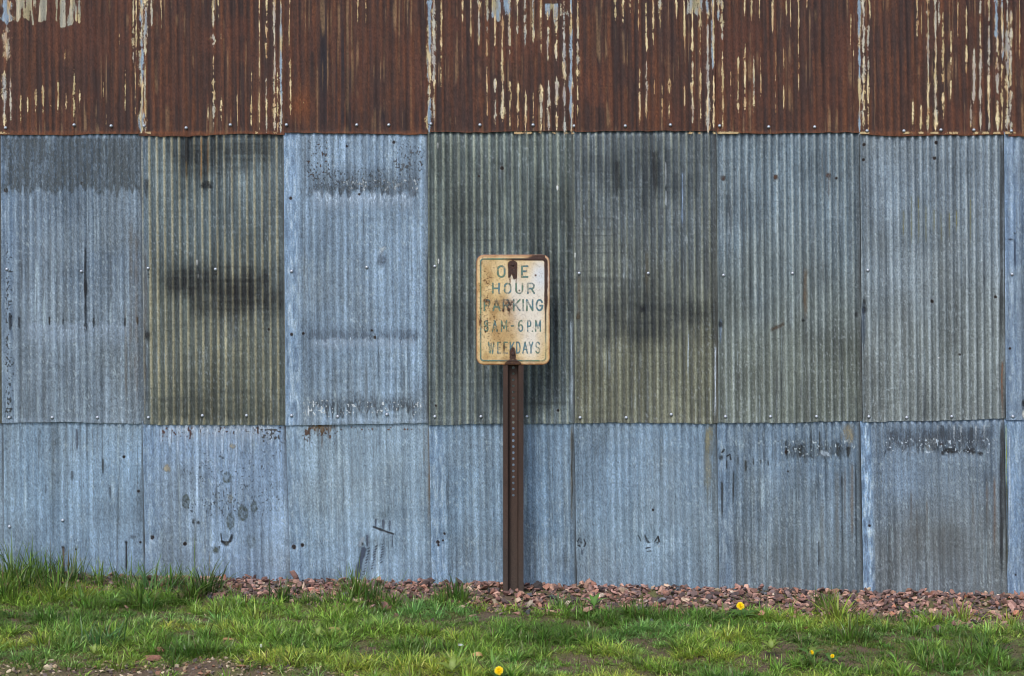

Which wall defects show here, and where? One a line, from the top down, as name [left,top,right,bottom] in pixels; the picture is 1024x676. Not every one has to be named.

peeling [424,0,443,133]
corrosion [0,0,1024,170]
peeling [461,0,581,135]
peeling [613,0,762,134]
damp [3,138,140,196]
damp [168,266,269,310]
corrosion [302,425,373,444]
damp [303,400,422,418]
damp [781,425,855,458]
damp [883,425,995,455]